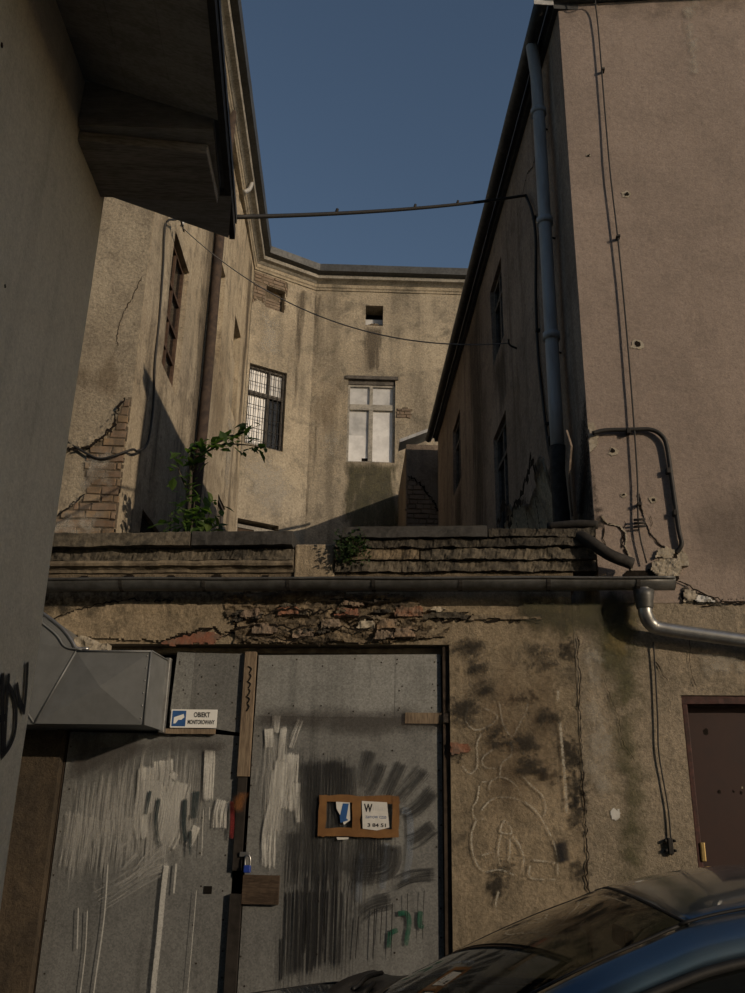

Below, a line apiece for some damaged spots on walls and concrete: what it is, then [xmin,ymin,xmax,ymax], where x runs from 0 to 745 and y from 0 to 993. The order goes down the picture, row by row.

crack [116,277,142,346]
spalling [54,397,132,533]
leakage [345,464,398,527]
spalling [405,475,439,526]
flaking render [497,452,553,529]
spalling [565,404,698,600]
spalling [54,591,450,647]
leakage [449,638,494,725]
leakage [486,707,587,833]
crack [576,637,635,892]
leakage [488,860,515,896]